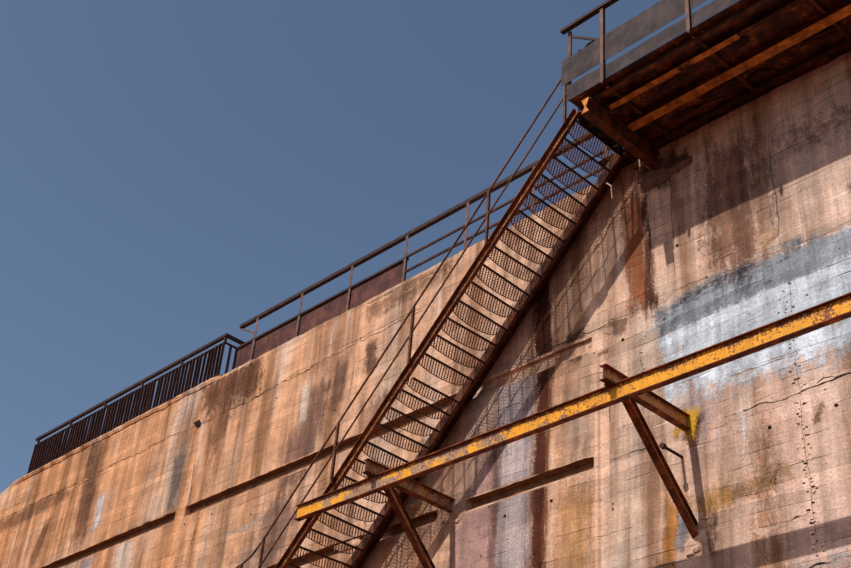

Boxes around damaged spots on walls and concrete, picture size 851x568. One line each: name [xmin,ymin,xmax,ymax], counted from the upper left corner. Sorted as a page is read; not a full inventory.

leakage [653,118,851,365]
leakage [495,374,538,428]
leakage [664,317,851,447]
crack [729,354,793,380]
crack [705,372,851,433]
leakage [158,440,194,516]
leakage [448,434,537,568]
crack [810,555,851,568]